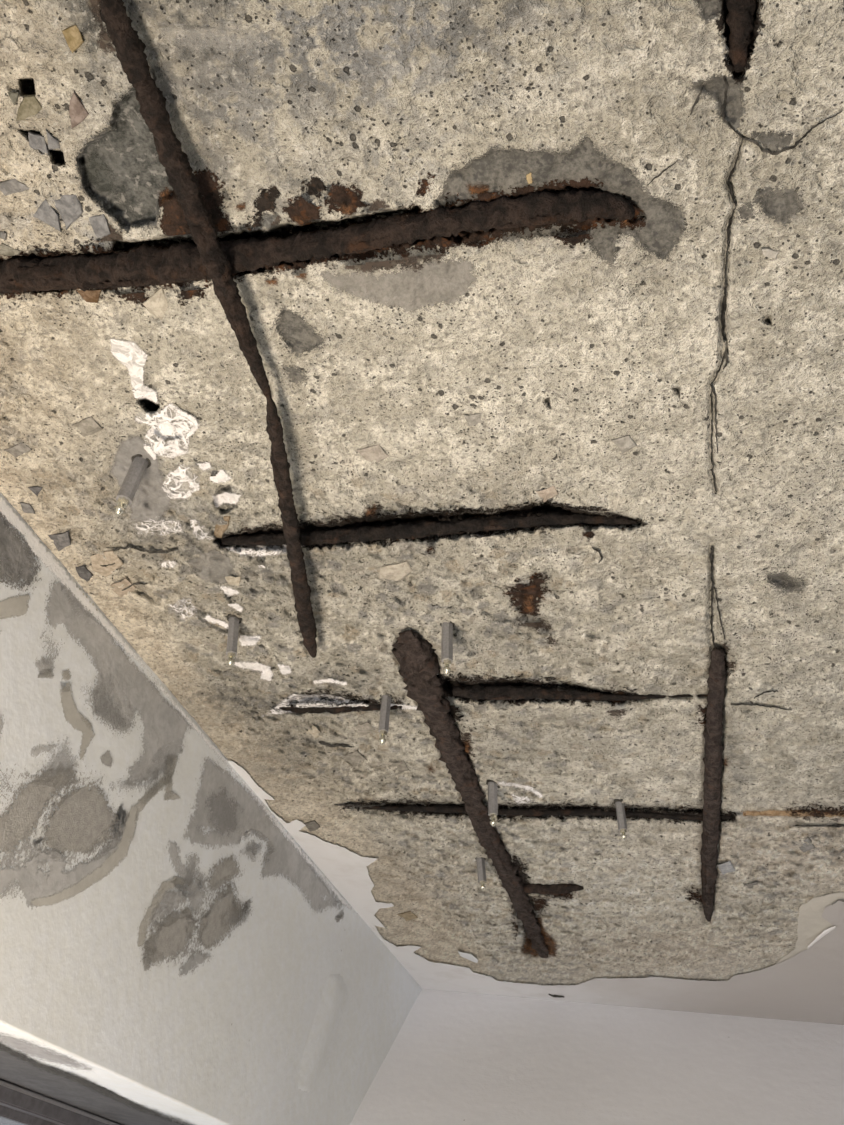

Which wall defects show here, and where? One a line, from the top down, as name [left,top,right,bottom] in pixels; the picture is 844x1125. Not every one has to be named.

corrosion [715,0,765,85]
spalling [0,0,193,260]
corrosion [0,0,647,658]
crack [690,76,842,492]
damp [110,339,241,507]
peeling [0,580,190,910]
peeling [137,841,253,978]
damp [170,598,261,646]
damp [235,661,292,681]
peeling [183,756,352,922]
damp [263,677,368,717]
corrosion [271,630,844,958]